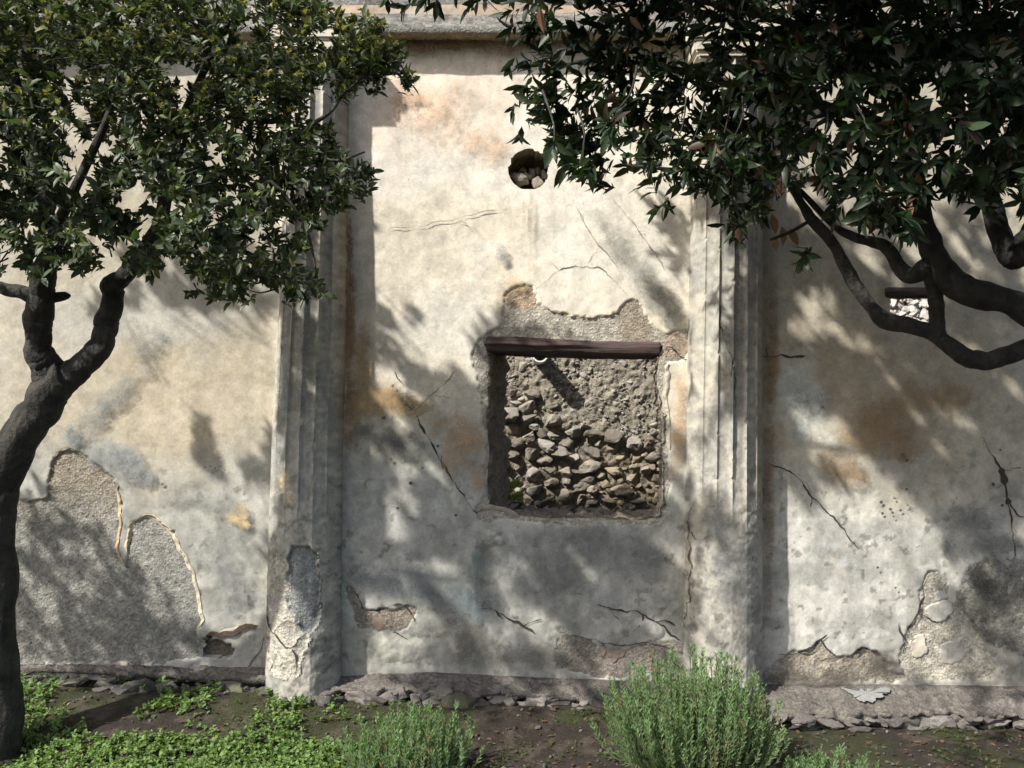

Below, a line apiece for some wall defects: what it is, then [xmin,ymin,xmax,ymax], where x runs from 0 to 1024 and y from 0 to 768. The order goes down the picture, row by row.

crack [379,210,503,233]
flaking render [15,449,206,665]
flaking render [266,545,323,681]
flaking render [345,585,416,632]
crack [394,371,477,514]
crack [465,603,542,633]
flaking render [472,285,688,527]
crack [565,509,695,658]
crack [770,464,858,548]
flaking render [762,556,1024,703]
crack [983,437,1023,560]